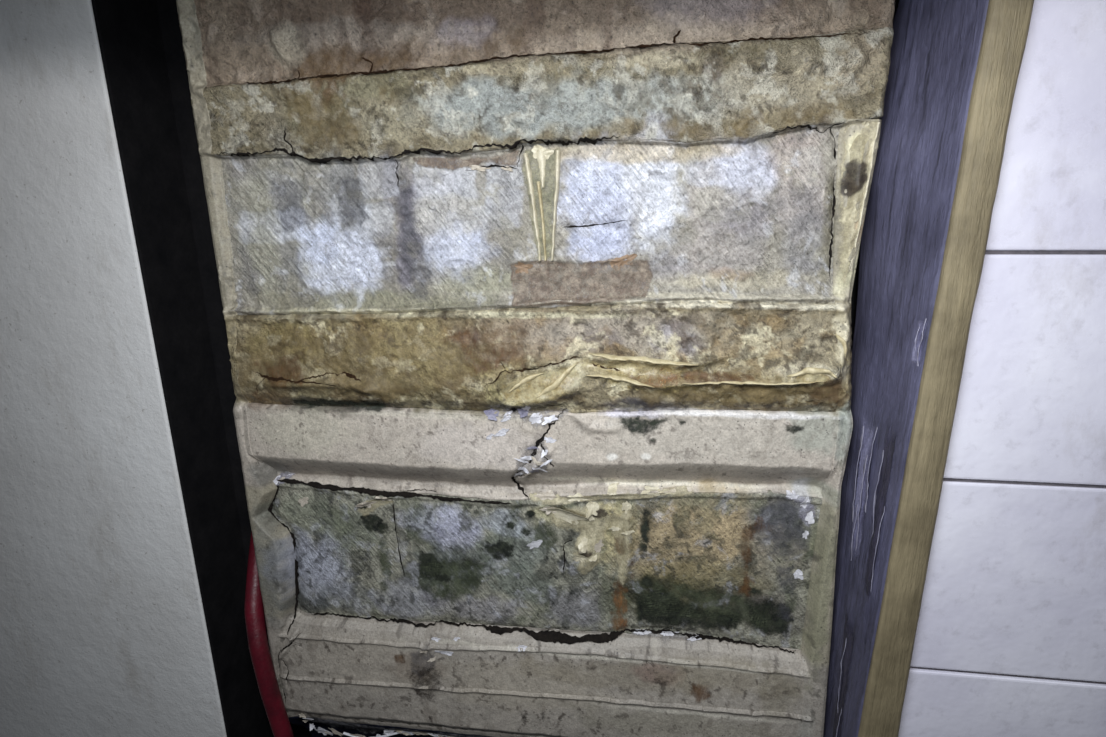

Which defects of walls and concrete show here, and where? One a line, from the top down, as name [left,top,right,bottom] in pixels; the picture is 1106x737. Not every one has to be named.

crack [214,30,866,87]
crack [217,129,620,185]
crack [254,371,361,393]
leakage [359,502,391,590]
leakage [419,553,482,601]
leakage [485,540,514,558]
crack [268,405,794,736]
leakage [507,511,557,548]
leakage [639,509,651,551]
leakage [634,577,791,635]
peeling [298,713,486,737]